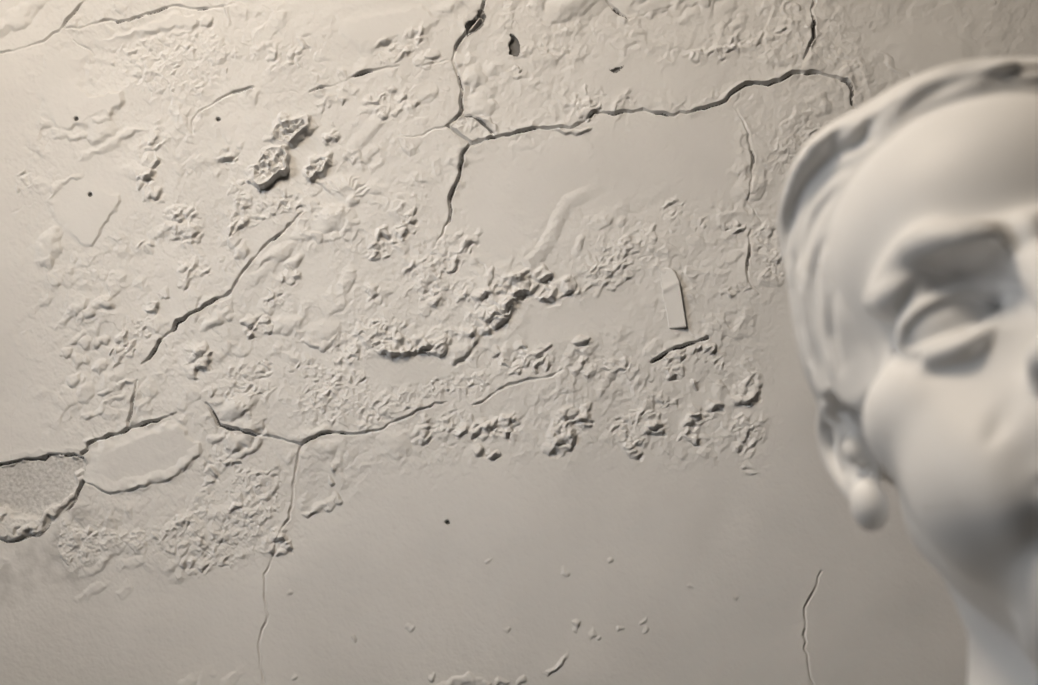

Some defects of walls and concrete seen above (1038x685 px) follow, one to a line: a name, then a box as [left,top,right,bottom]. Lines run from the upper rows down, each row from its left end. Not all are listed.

crack [0,0,238,81]
peeling [212,86,421,240]
crack [142,0,861,299]
spalling [0,419,293,582]
crack [78,207,566,685]
crack [800,568,825,685]